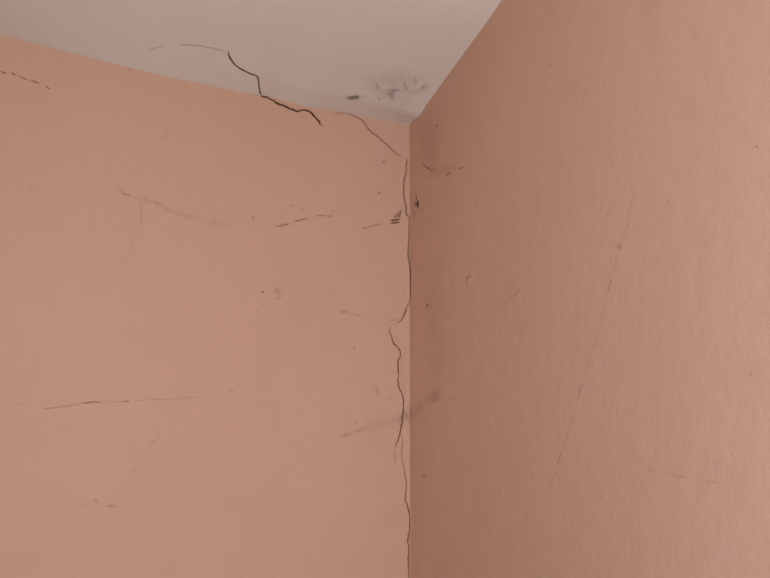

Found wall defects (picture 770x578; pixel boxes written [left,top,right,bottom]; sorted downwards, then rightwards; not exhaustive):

crack [228,53,321,125]
crack [389,157,411,446]
crack [405,468,414,578]